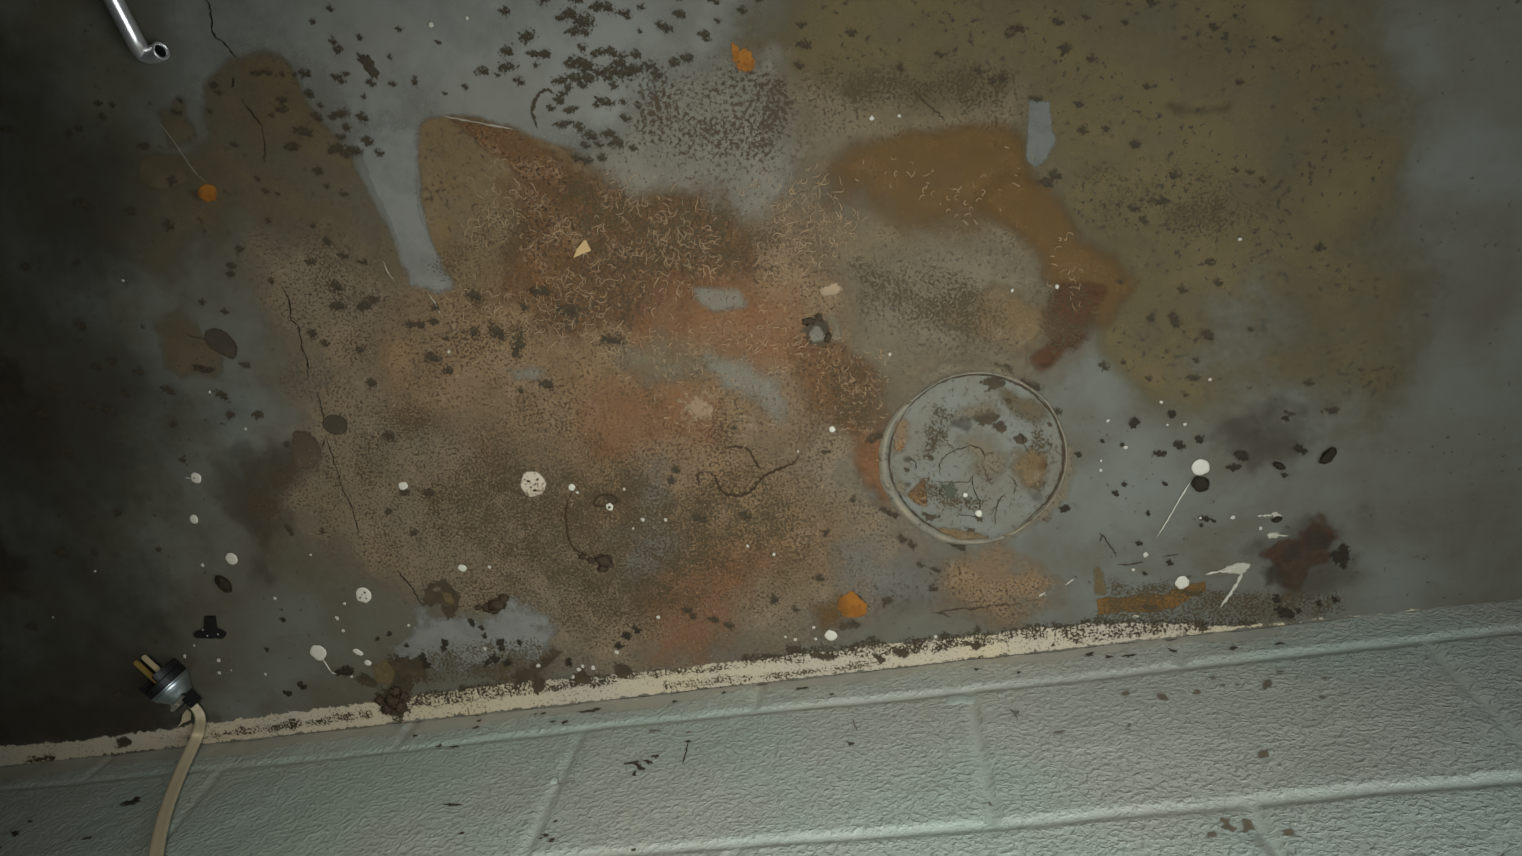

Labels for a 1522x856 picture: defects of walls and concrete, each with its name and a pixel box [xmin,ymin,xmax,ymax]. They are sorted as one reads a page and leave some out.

crack [206,0,266,161]
rust [454,120,755,336]
rust [832,126,1132,369]
damp [140,0,1407,679]
rust [795,340,906,498]
rust [820,591,868,633]
rust [1261,518,1334,589]